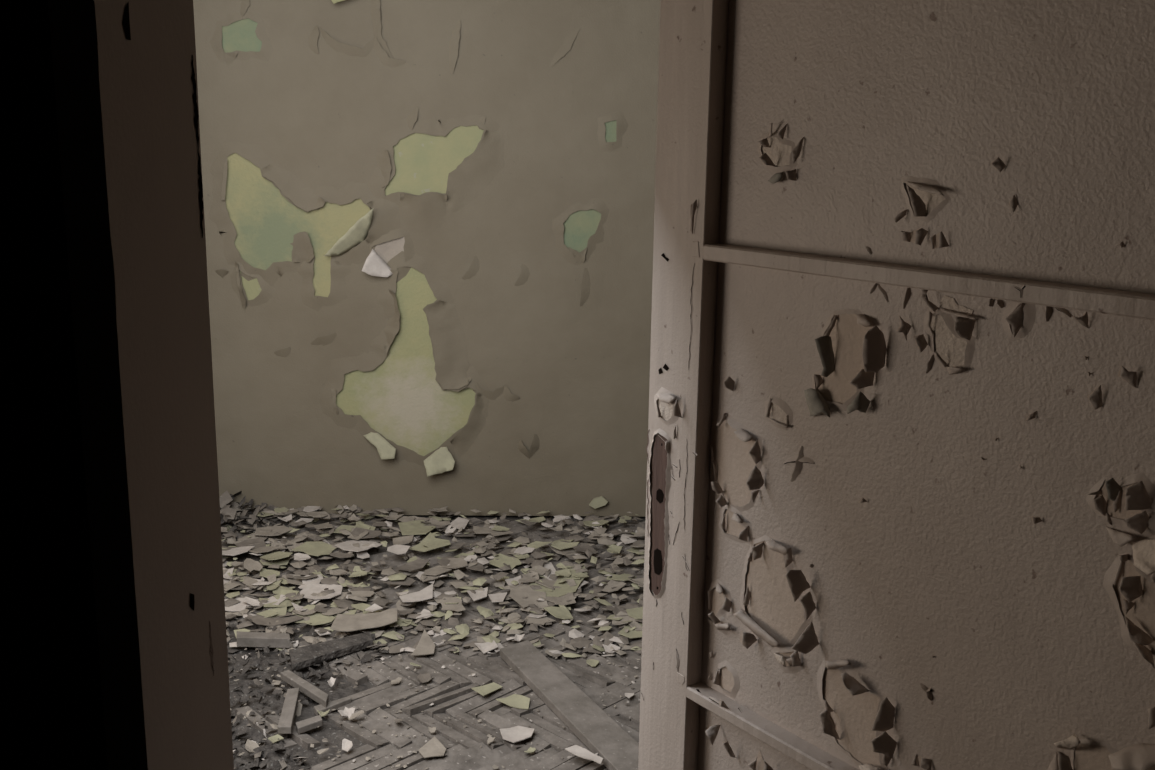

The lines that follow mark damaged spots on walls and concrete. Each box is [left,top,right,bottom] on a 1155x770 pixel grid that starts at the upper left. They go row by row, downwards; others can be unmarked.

peeling [758,123,804,184]
peeling [894,177,951,249]
peeling [208,115,504,477]
peeling [804,289,978,417]
peeling [1002,301,1036,342]
peeling [764,395,793,431]
peeling [706,413,819,674]
peeling [1086,472,1155,669]
peeling [704,725,736,758]
peeling [708,651,740,709]
peeling [817,659,897,770]
peeling [1047,733,1155,770]